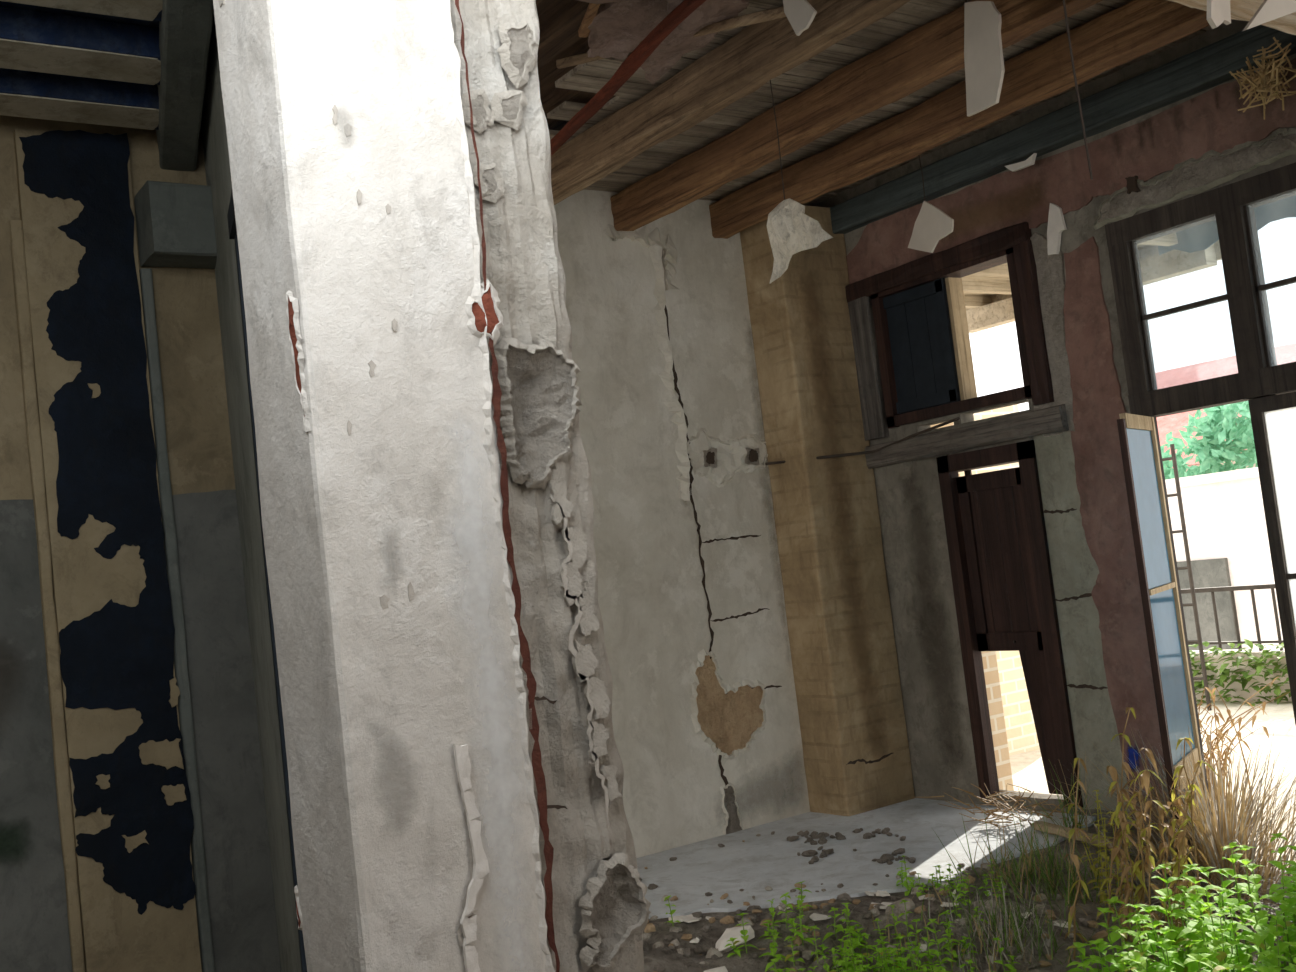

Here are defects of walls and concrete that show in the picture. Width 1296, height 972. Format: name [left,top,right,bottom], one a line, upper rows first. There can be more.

peeling [19,130,196,915]
flaking render [465,279,623,826]
flaking render [578,853,651,972]
crack [648,246,769,659]
crack [717,747,729,787]
flaking render [690,649,767,760]